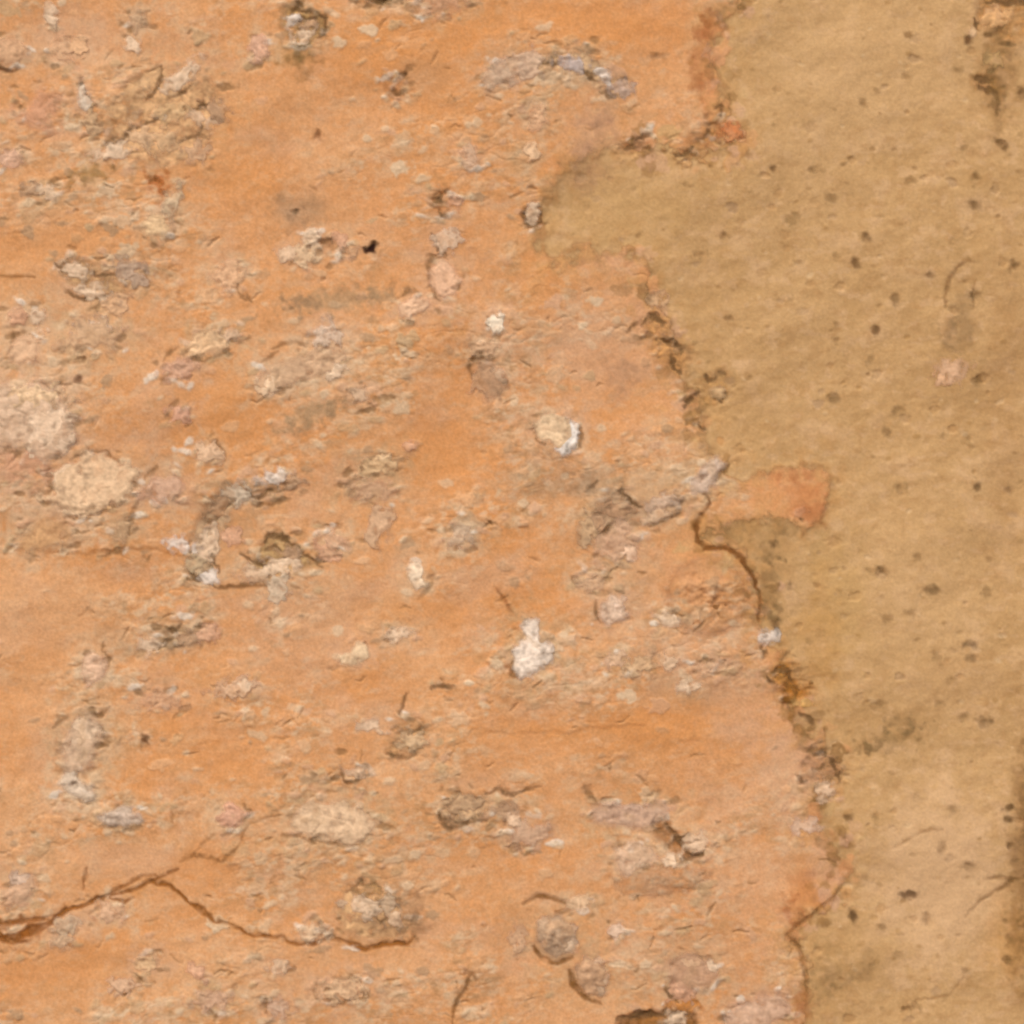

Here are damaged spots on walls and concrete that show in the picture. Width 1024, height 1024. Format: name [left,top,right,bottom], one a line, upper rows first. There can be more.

spalling [485,49,636,98]
peeling [523,0,1024,1024]
crack [694,501,759,591]
peeling [510,619,554,678]
spalling [438,789,551,845]
crack [0,872,318,945]
crack [349,940,412,951]